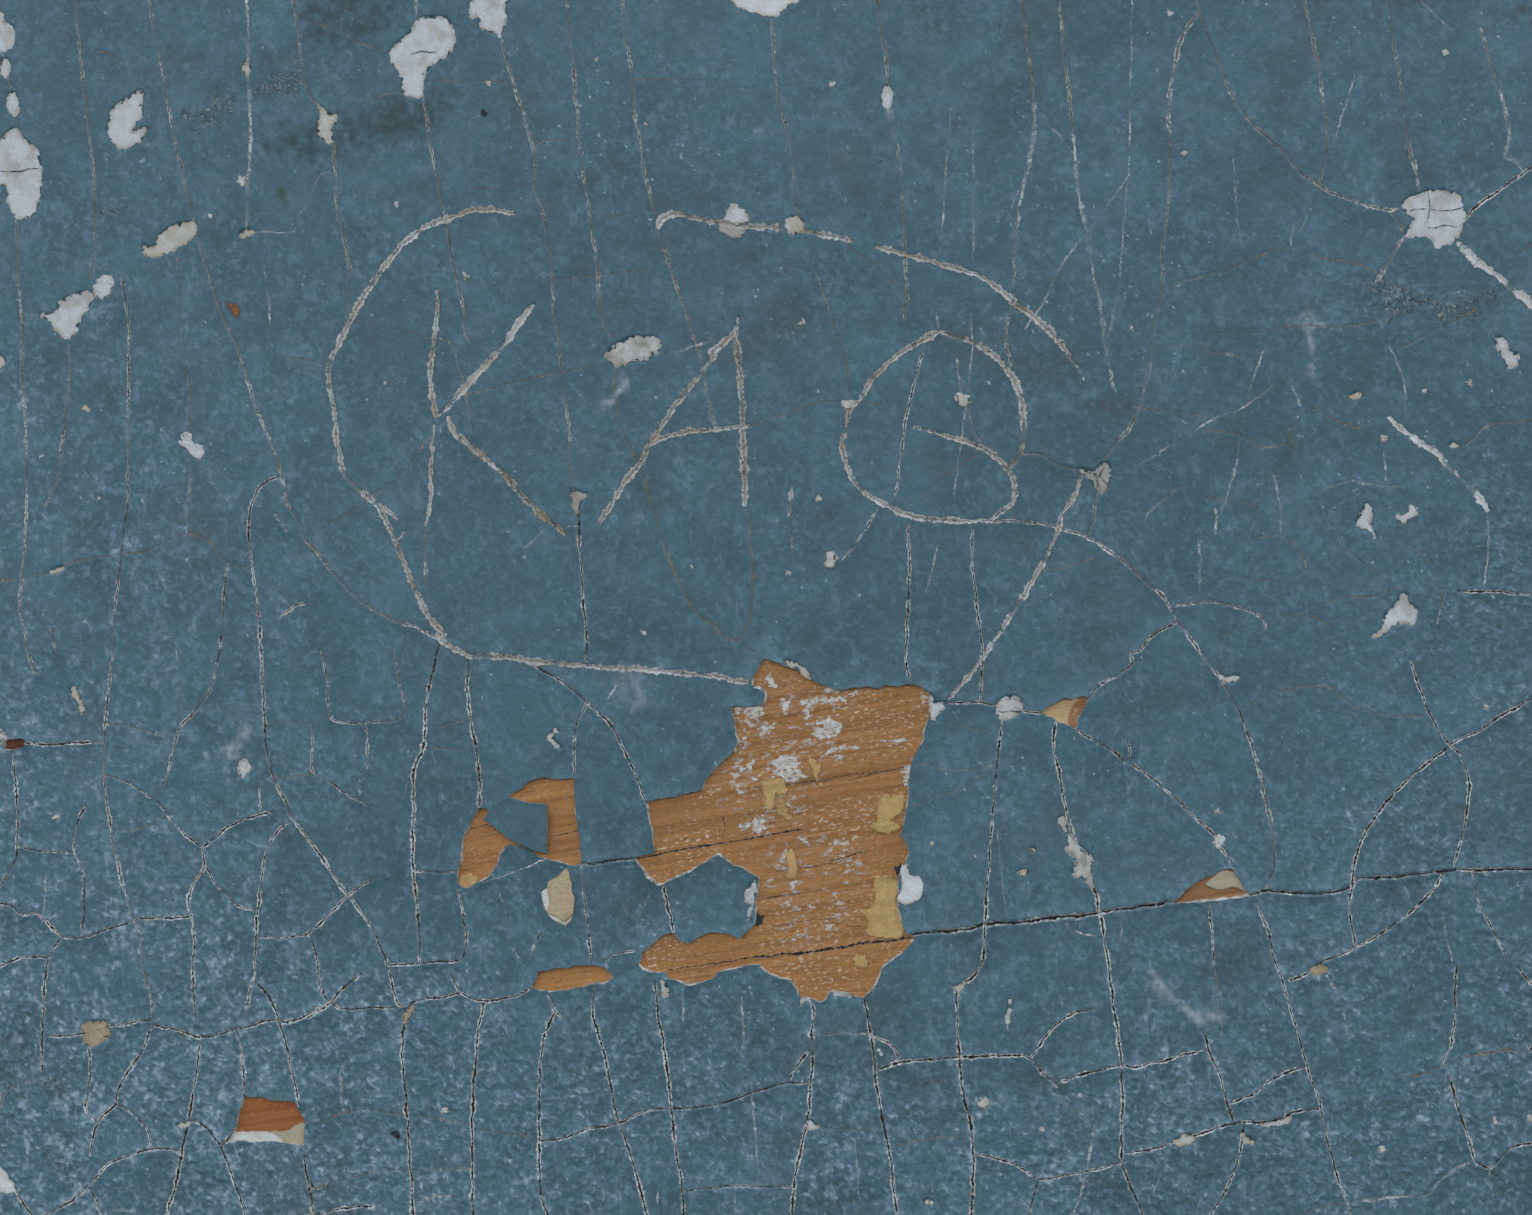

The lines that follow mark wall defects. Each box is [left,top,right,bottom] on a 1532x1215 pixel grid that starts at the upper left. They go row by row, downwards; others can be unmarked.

peeling [0,11,43,220]
peeling [107,90,147,150]
crack [245,0,253,179]
peeling [389,16,456,99]
crack [1120,0,1420,323]
peeling [1401,189,1466,249]
crack [1466,27,1532,220]
crack [488,4,647,804]
crack [842,0,1124,680]
crack [1196,387,1361,571]
peeling [458,778,581,887]
peeling [636,660,948,1007]